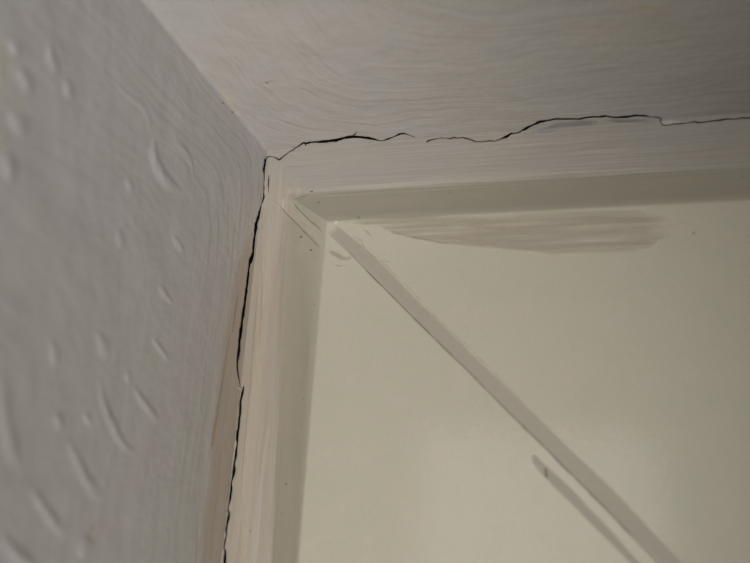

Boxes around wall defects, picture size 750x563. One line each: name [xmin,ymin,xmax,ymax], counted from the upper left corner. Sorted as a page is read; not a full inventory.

crack [223,115,750,563]